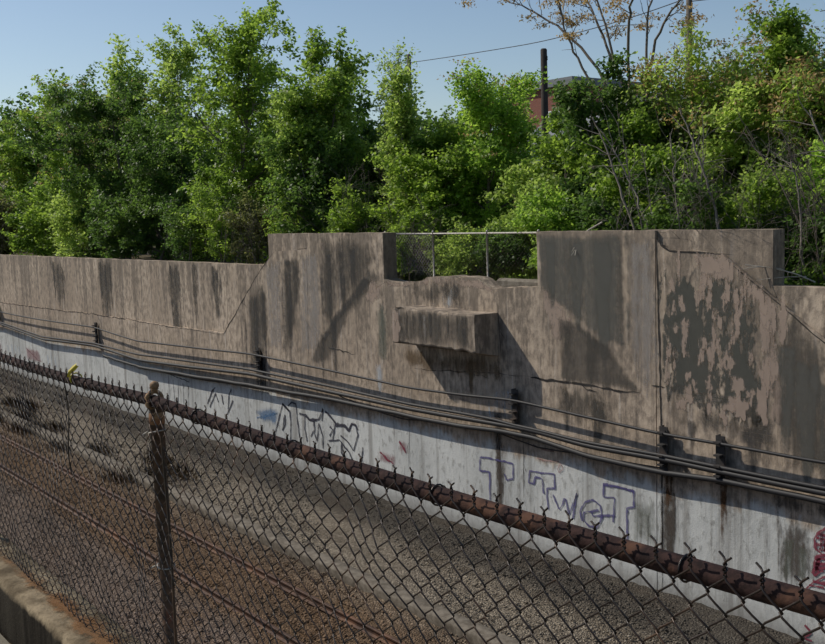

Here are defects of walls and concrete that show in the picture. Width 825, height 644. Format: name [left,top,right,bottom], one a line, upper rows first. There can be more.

damp [98,262,113,315]
damp [169,266,180,327]
damp [212,267,222,316]
damp [320,249,368,375]
crack [415,233,825,426]
crack [658,475,666,549]